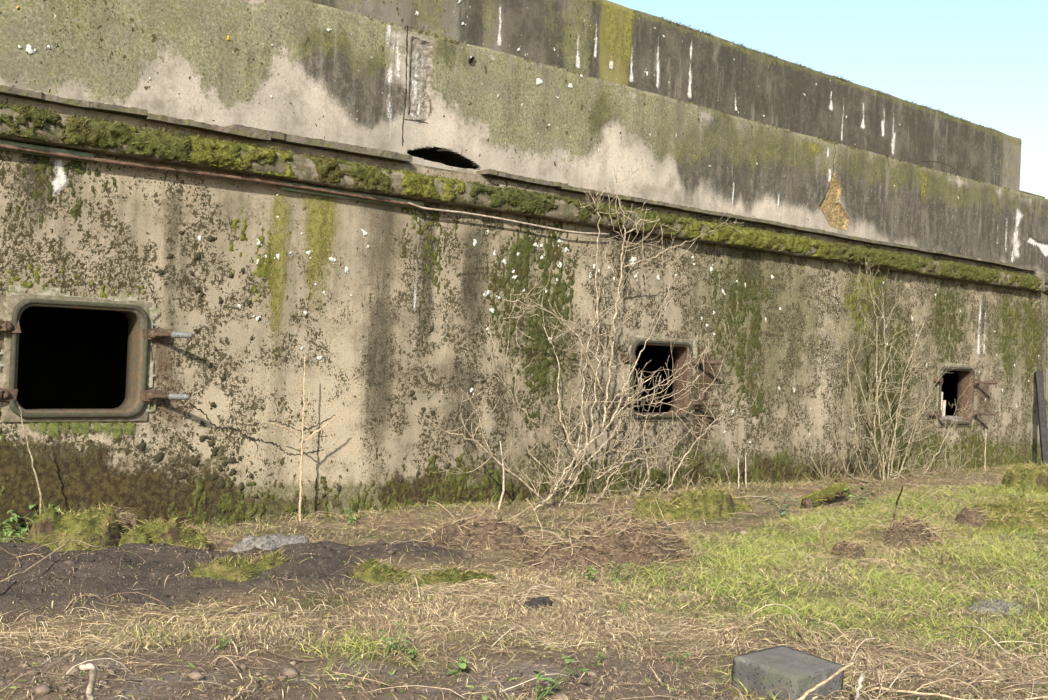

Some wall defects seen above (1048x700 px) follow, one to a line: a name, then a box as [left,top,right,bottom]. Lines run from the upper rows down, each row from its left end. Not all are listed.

efflorescence [386,25,400,82]
efflorescence [410,55,423,116]
hole [407,147,480,170]
damp [806,142,831,182]
spalling [819,171,850,231]
rust [689,348,717,435]
crack [190,403,335,456]